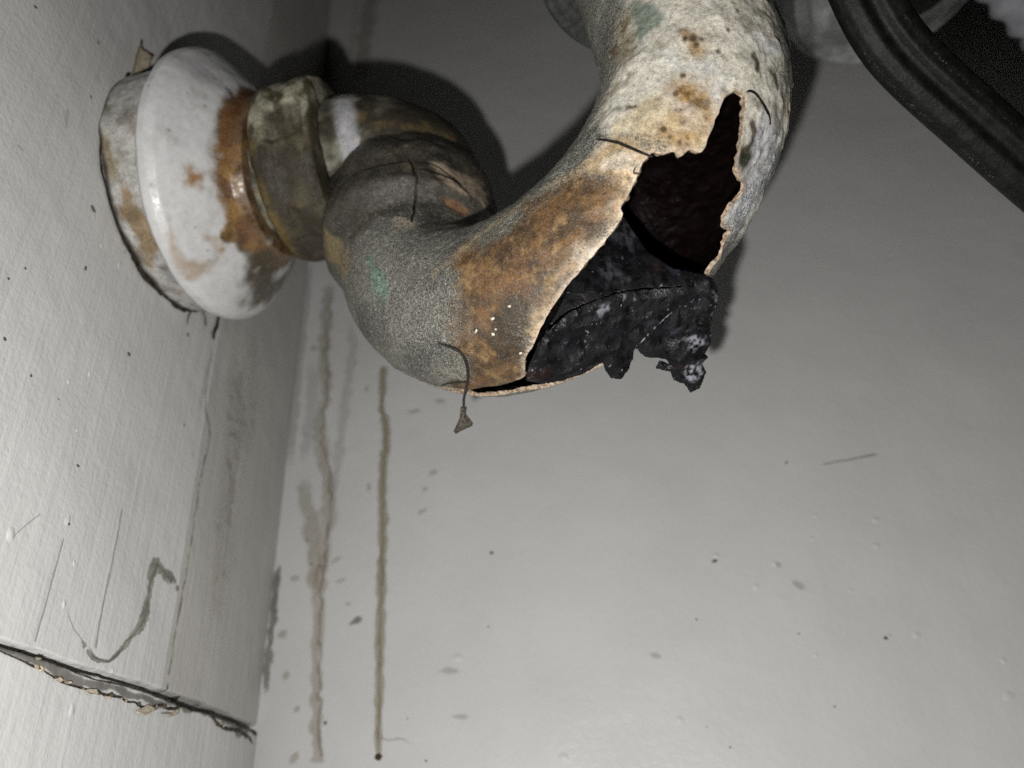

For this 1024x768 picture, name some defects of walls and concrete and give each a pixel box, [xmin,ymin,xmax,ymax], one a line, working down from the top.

crack [0,647,257,744]